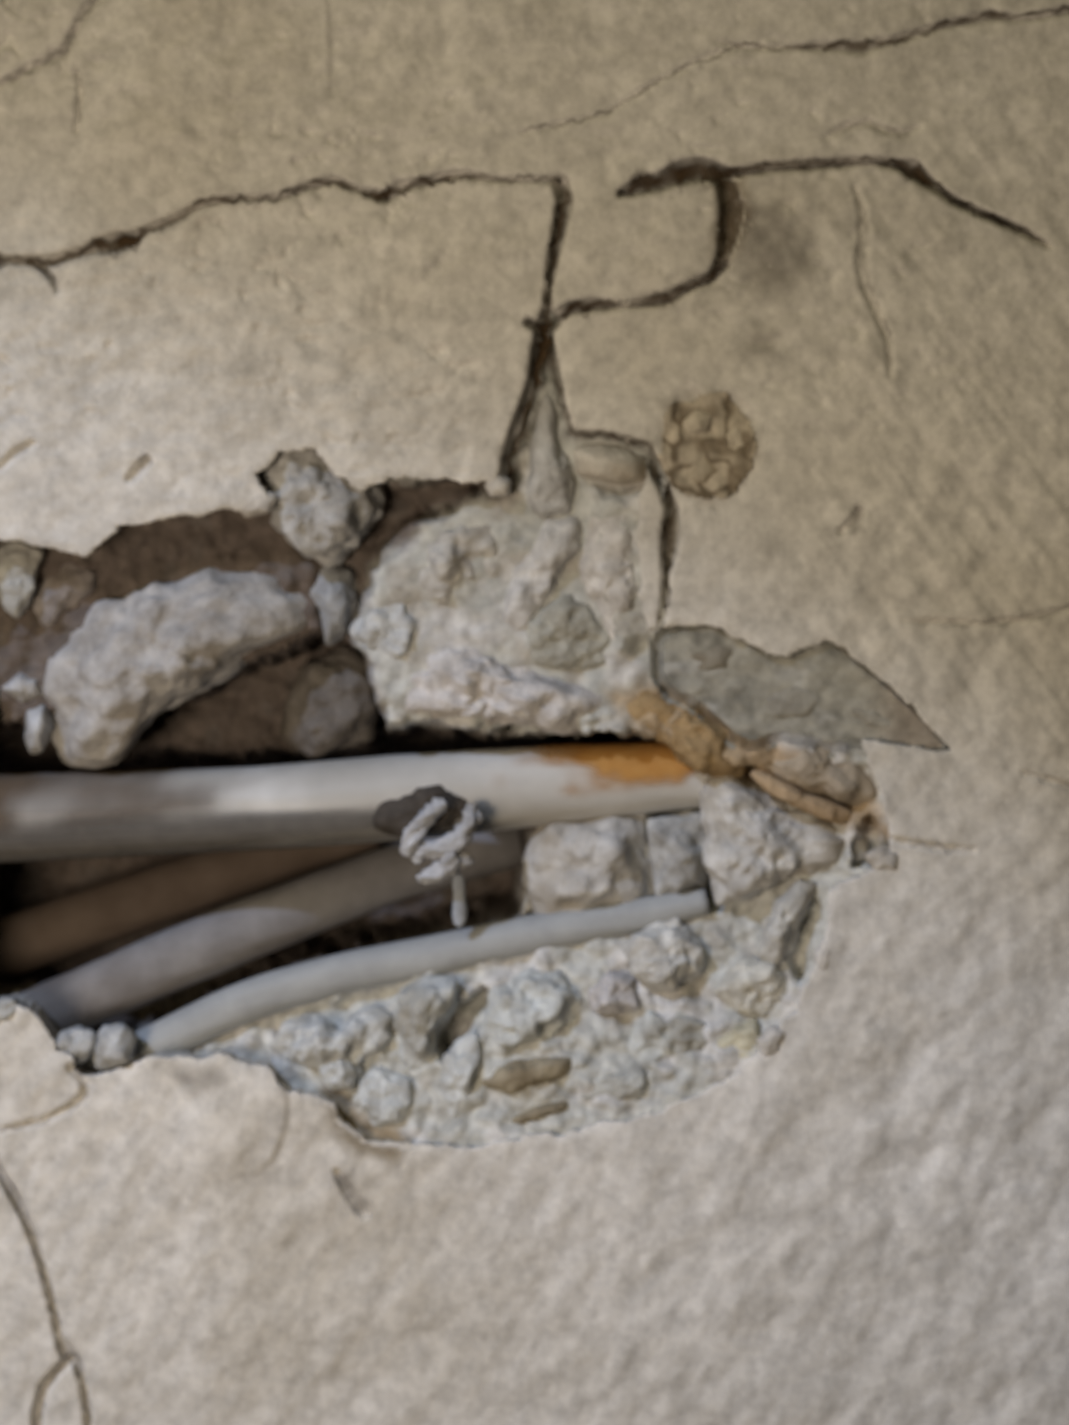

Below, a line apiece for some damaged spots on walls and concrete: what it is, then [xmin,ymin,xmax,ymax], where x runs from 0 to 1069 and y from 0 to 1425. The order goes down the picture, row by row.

crack [800,6,1069,51]
crack [193,175,484,209]
crack [626,157,1017,231]
crack [0,229,152,283]
crack [505,187,720,607]
spalling [0,312,951,1147]
rust [543,742,694,783]